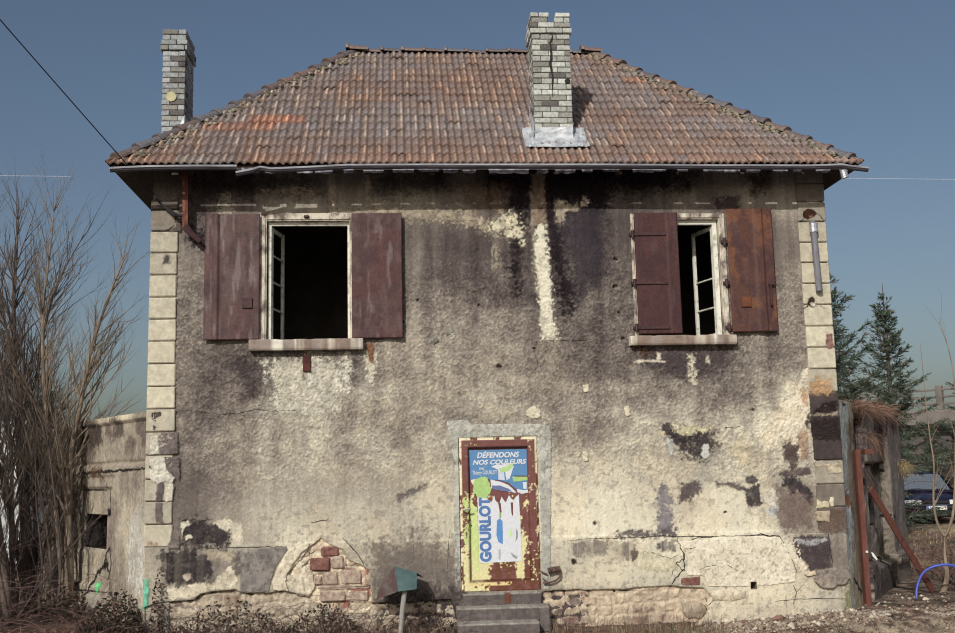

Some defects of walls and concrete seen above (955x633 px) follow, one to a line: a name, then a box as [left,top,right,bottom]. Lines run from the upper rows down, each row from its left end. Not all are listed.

crack [547,33,555,97]
leakage [218,190,235,214]
leakage [258,169,697,390]
leakage [260,351,352,417]
peeling [761,368,854,589]
spalling [166,519,457,633]
crack [571,533,886,604]